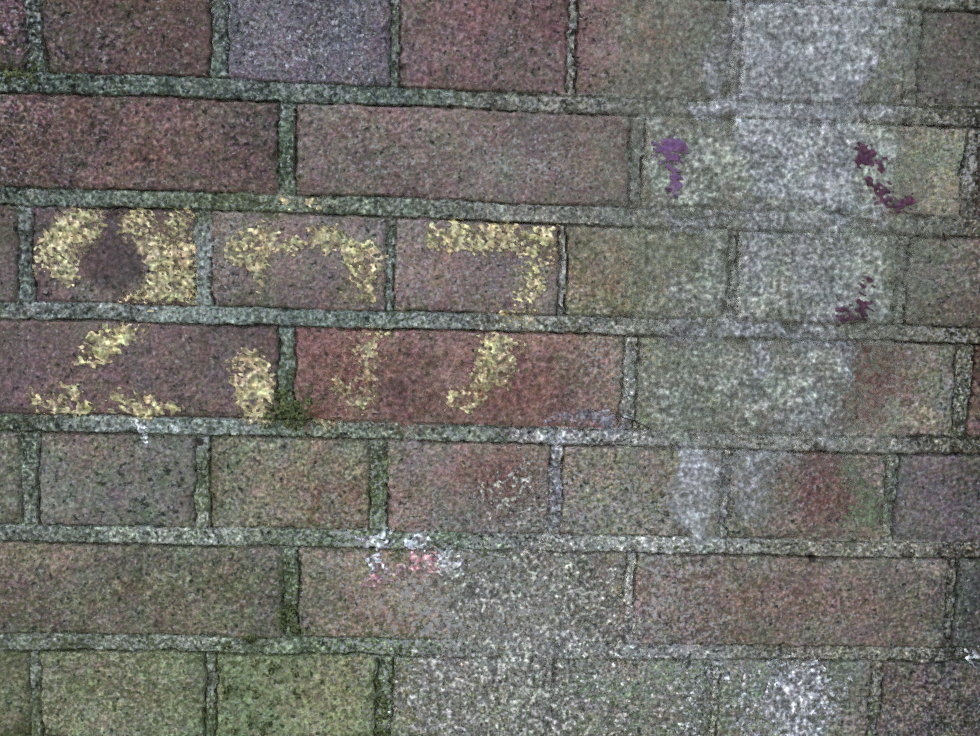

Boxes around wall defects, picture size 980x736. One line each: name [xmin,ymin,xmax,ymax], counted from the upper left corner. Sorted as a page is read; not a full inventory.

leakage [544,405,623,442]
leakage [581,0,942,543]